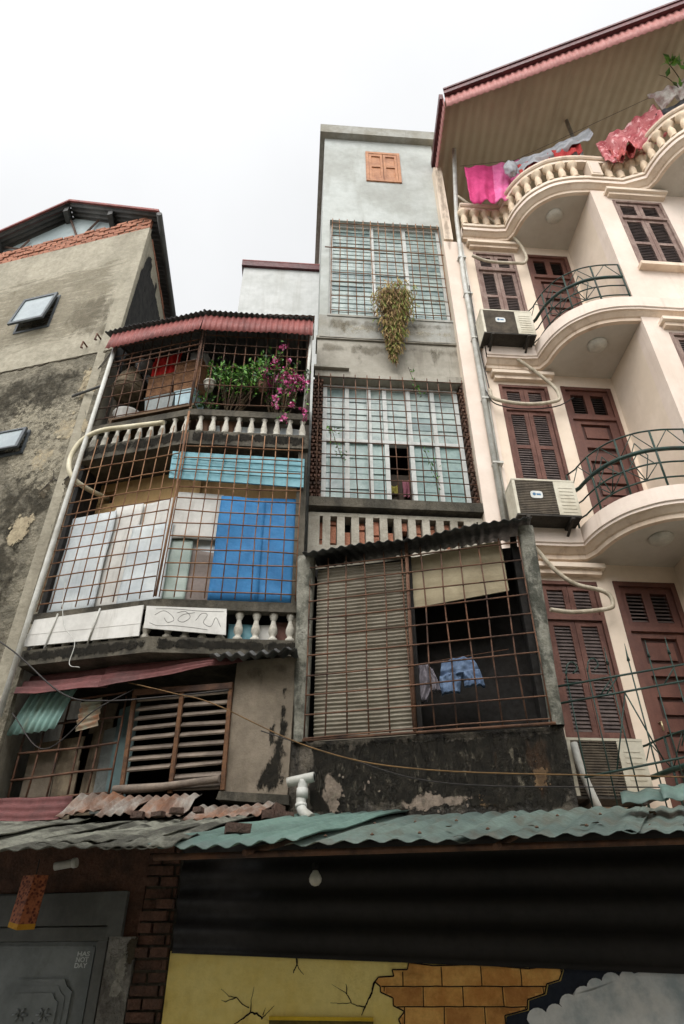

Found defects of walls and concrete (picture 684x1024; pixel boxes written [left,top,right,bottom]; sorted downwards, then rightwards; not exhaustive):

leakage [0,370,78,447]
peeling [6,513,35,546]
leakage [256,688,288,792]
leakage [307,729,572,814]
peeling [322,773,345,813]
peeling [401,791,492,813]
crack [221,989,274,1024]
crack [333,982,375,1015]